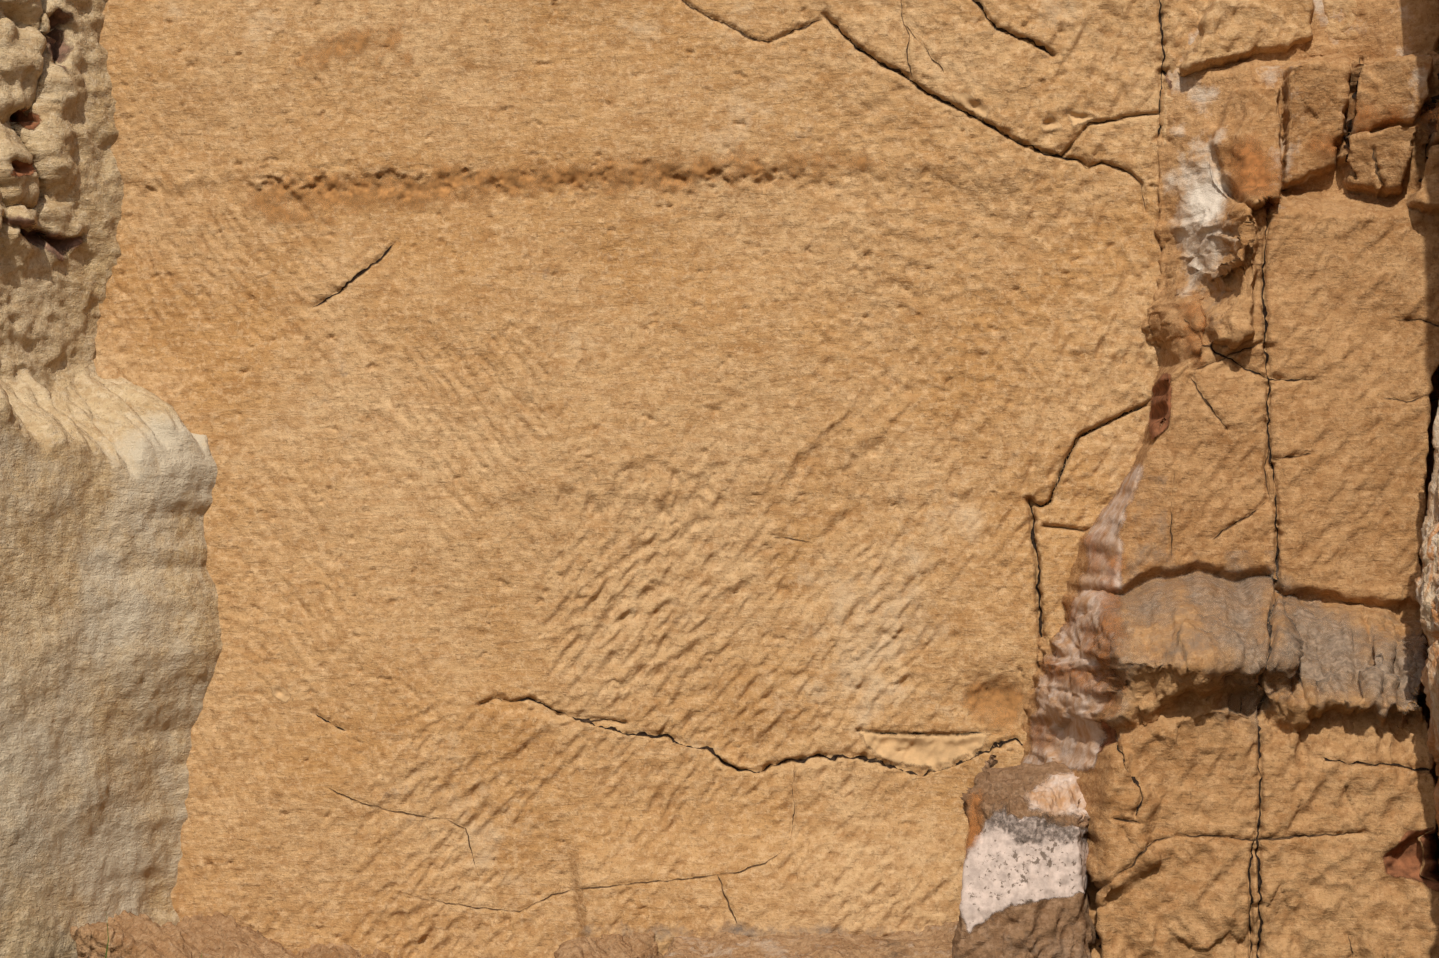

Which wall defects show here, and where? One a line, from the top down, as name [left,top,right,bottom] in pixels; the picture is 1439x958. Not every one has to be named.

crack [1029,406,1144,637]
crack [1098,205,1365,958]
crack [328,697,1023,923]
spalling [1025,772,1090,819]